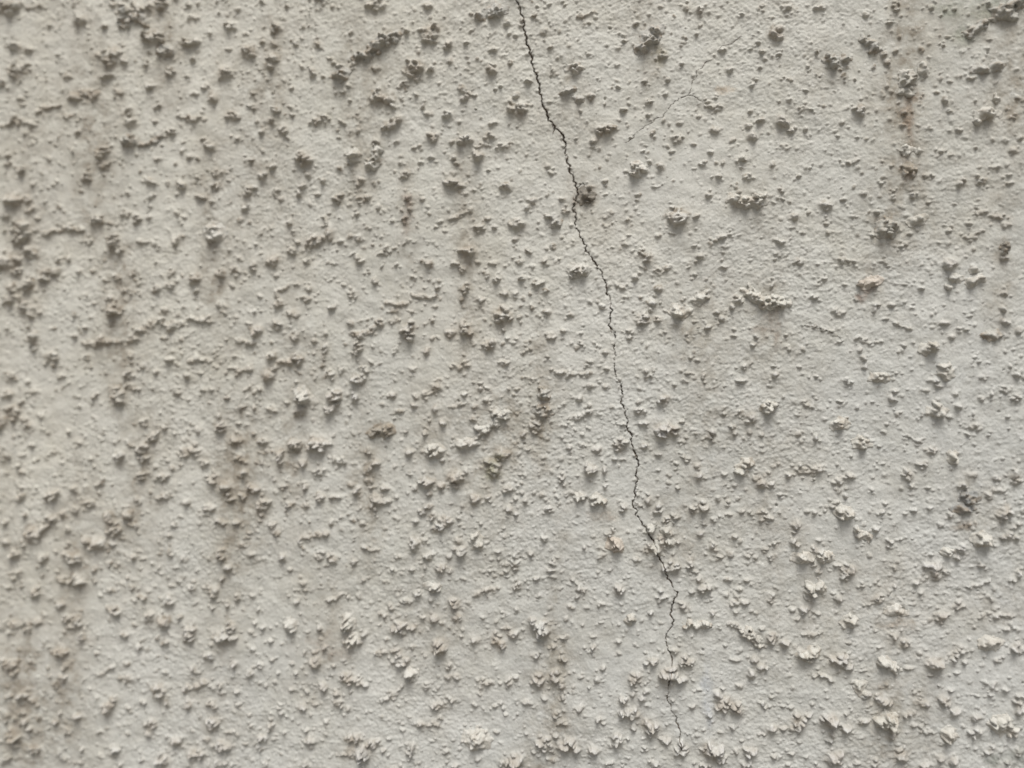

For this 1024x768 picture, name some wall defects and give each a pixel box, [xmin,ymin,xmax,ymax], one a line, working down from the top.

crack [516,1,682,750]
crack [627,36,741,142]